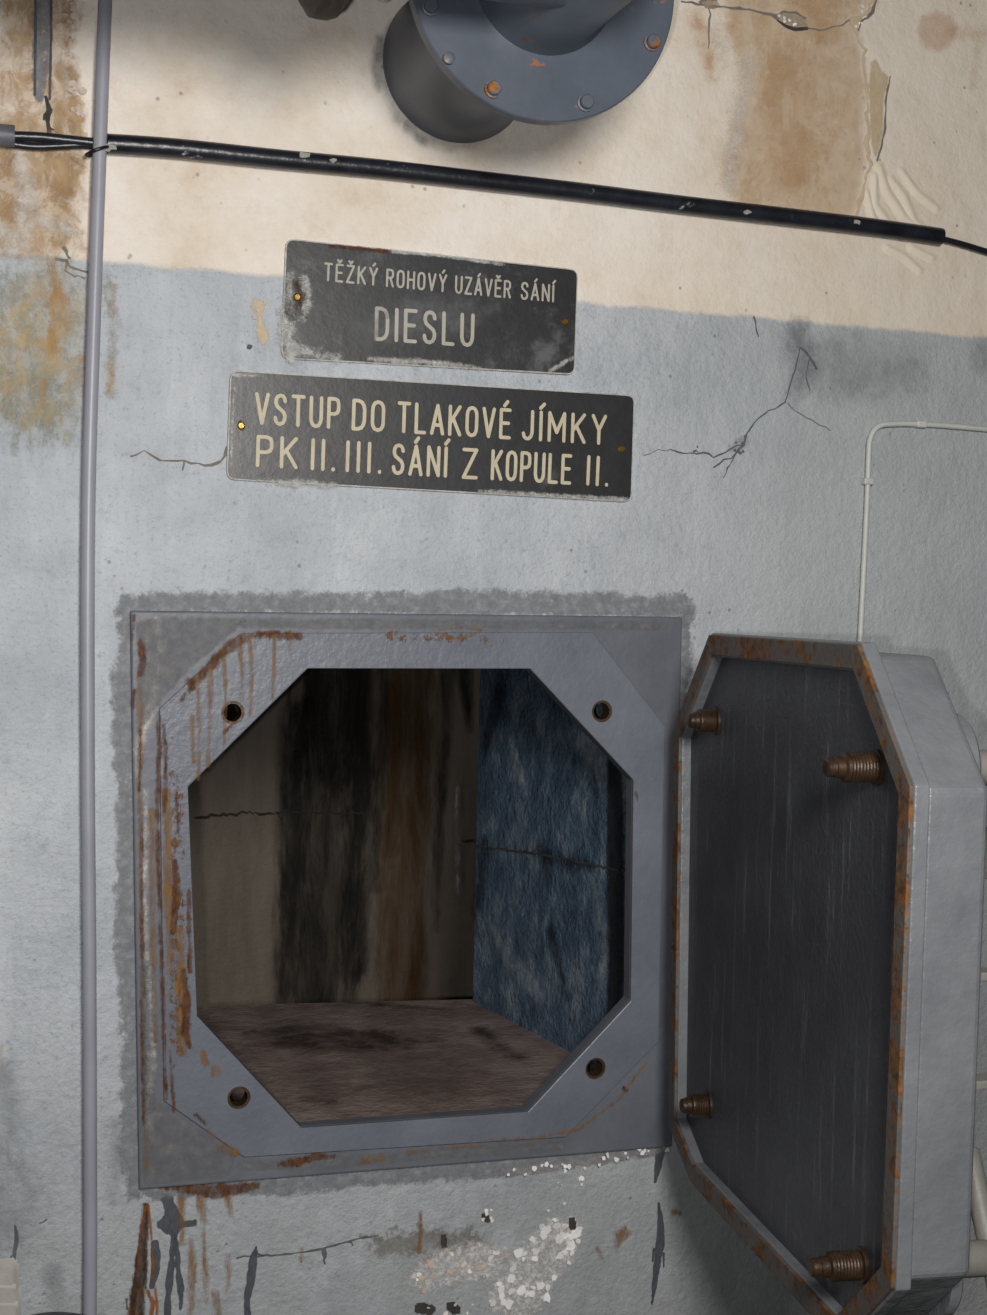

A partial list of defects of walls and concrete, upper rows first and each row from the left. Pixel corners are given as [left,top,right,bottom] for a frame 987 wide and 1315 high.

crack [681,1,850,49]
water stain [0,0,88,255]
flaking render [850,0,891,216]
water stain [0,269,83,440]
crack [130,446,227,471]
crack [644,347,830,478]
rust [180,631,302,705]
rust [386,631,488,645]
rust [132,615,215,1112]
spalling [507,1147,669,1186]
rust [129,1203,158,1315]
peeling [405,1202,583,1315]